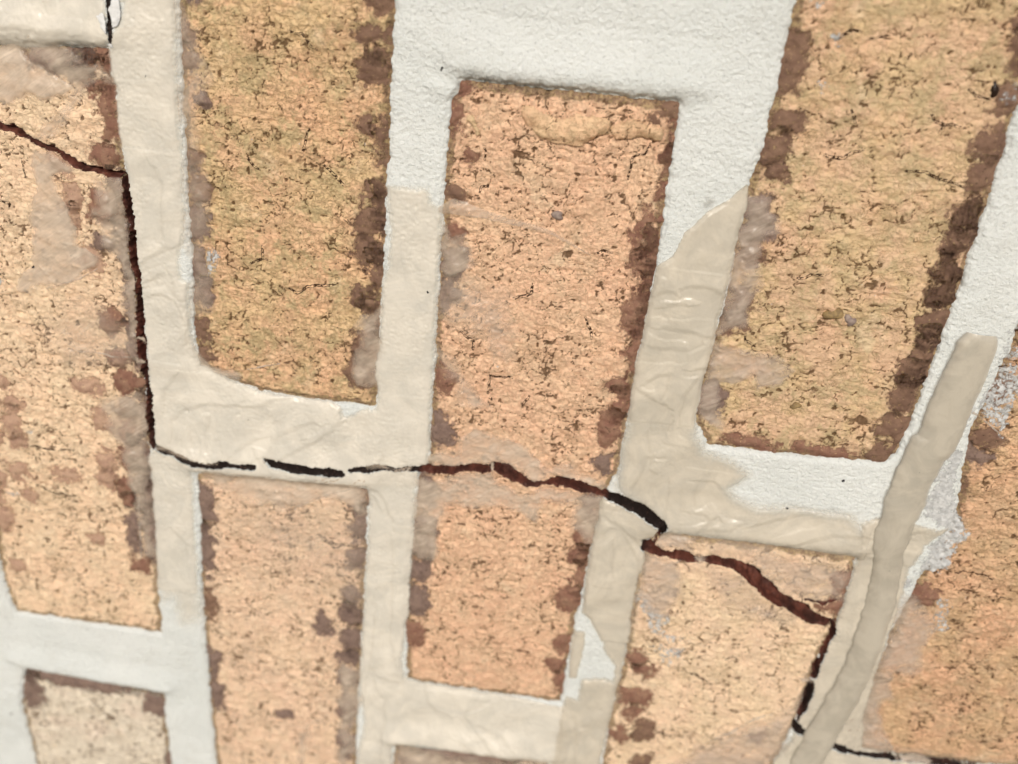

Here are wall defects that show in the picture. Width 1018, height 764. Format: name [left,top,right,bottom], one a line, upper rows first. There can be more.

crack [105,0,113,44]
crack [288,30,318,51]
crack [836,23,888,40]
crack [967,88,989,100]
crack [930,114,965,133]
crack [823,150,864,160]
crack [905,170,965,188]
crack [0,121,838,735]
crack [955,570,1011,602]
crack [833,743,976,764]